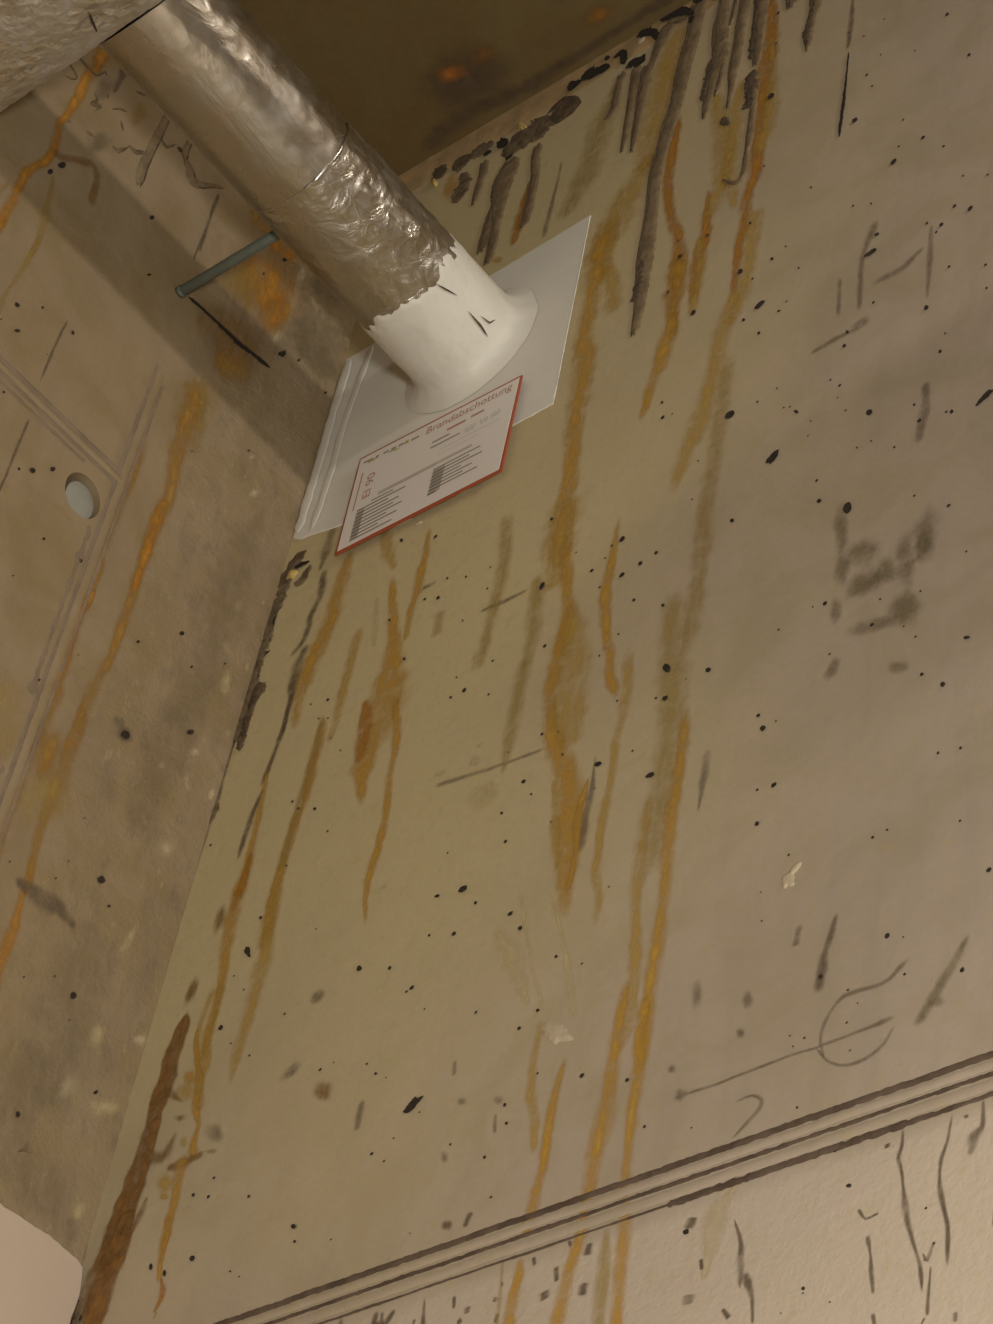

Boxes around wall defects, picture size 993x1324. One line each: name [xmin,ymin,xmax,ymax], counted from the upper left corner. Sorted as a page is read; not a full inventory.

corrosion [0,47,109,228]
corrosion [101,383,204,674]
crack [203,568,298,845]
corrosion [294,558,350,718]
corrosion [355,534,429,914]
corrosion [533,0,777,896]
spalling [71,1297,84,1324]
corrosion [80,774,268,1324]
corrosion [235,724,323,1060]
corrosion [496,1263,523,1324]
corrosion [525,1065,563,1232]
corrosion [553,605,688,1324]